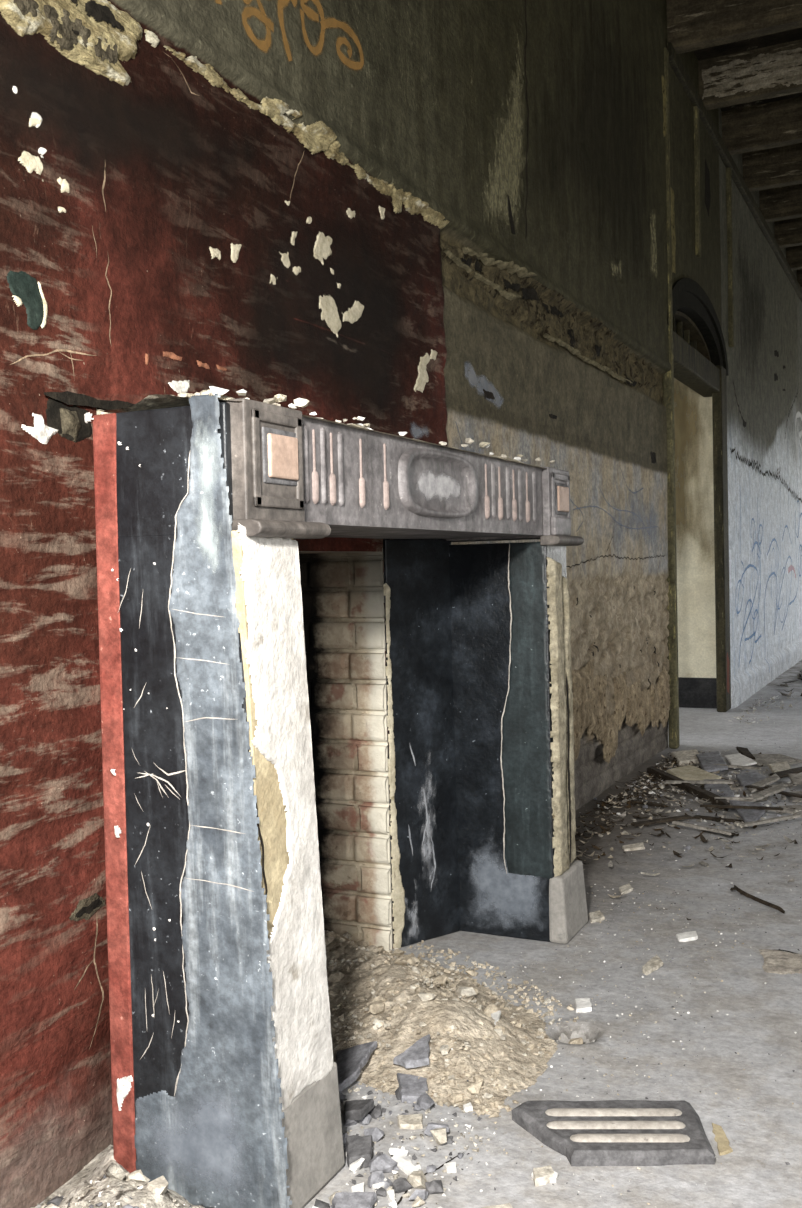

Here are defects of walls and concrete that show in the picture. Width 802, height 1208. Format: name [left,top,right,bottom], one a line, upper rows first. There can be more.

spalling [0,0,658,393]
crack [731,449,802,502]
peeling [117,380,292,1208]
peeling [312,1087,464,1208]